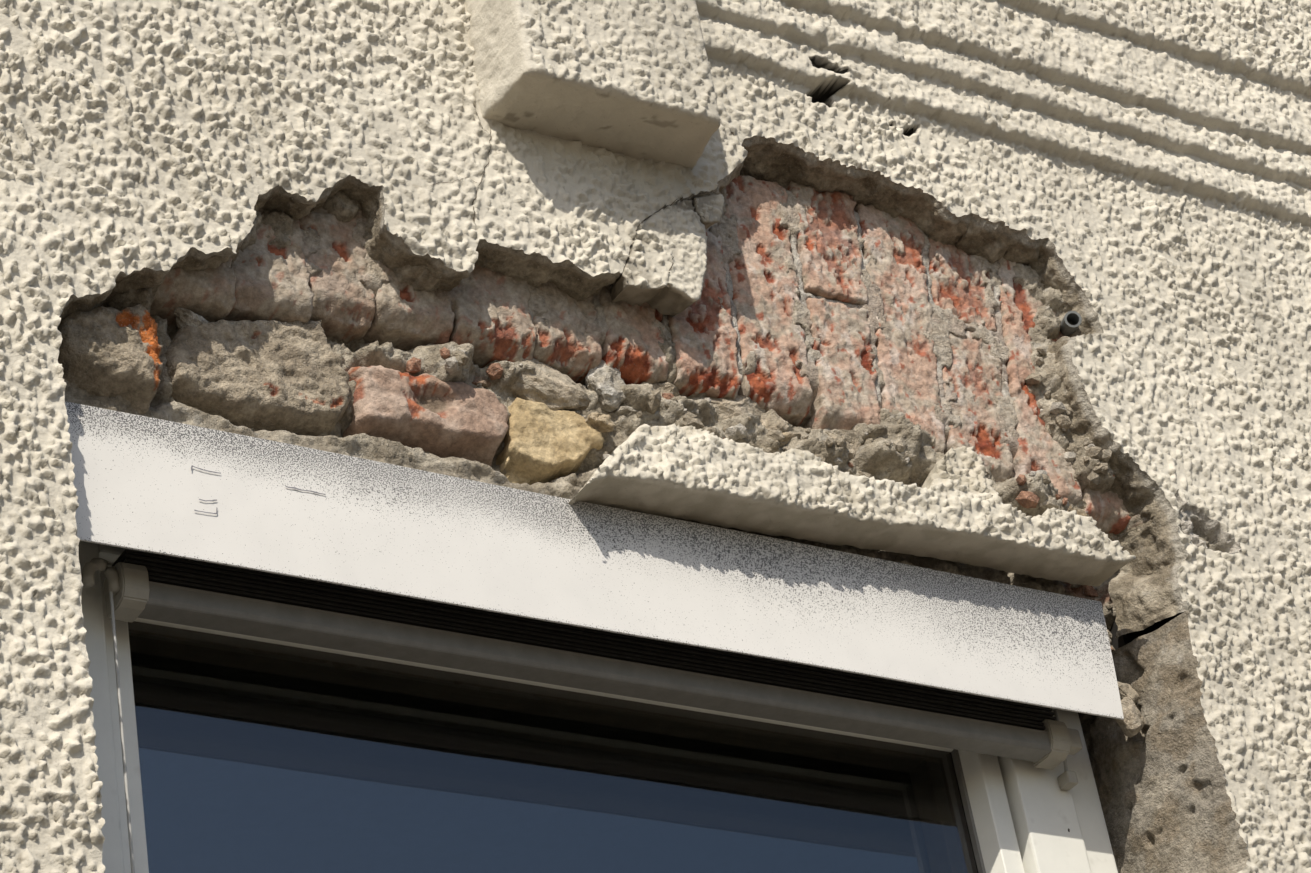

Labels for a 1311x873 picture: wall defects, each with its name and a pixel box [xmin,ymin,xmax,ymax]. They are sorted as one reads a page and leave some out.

spalling [57,135,1250,873]
crack [627,191,717,261]